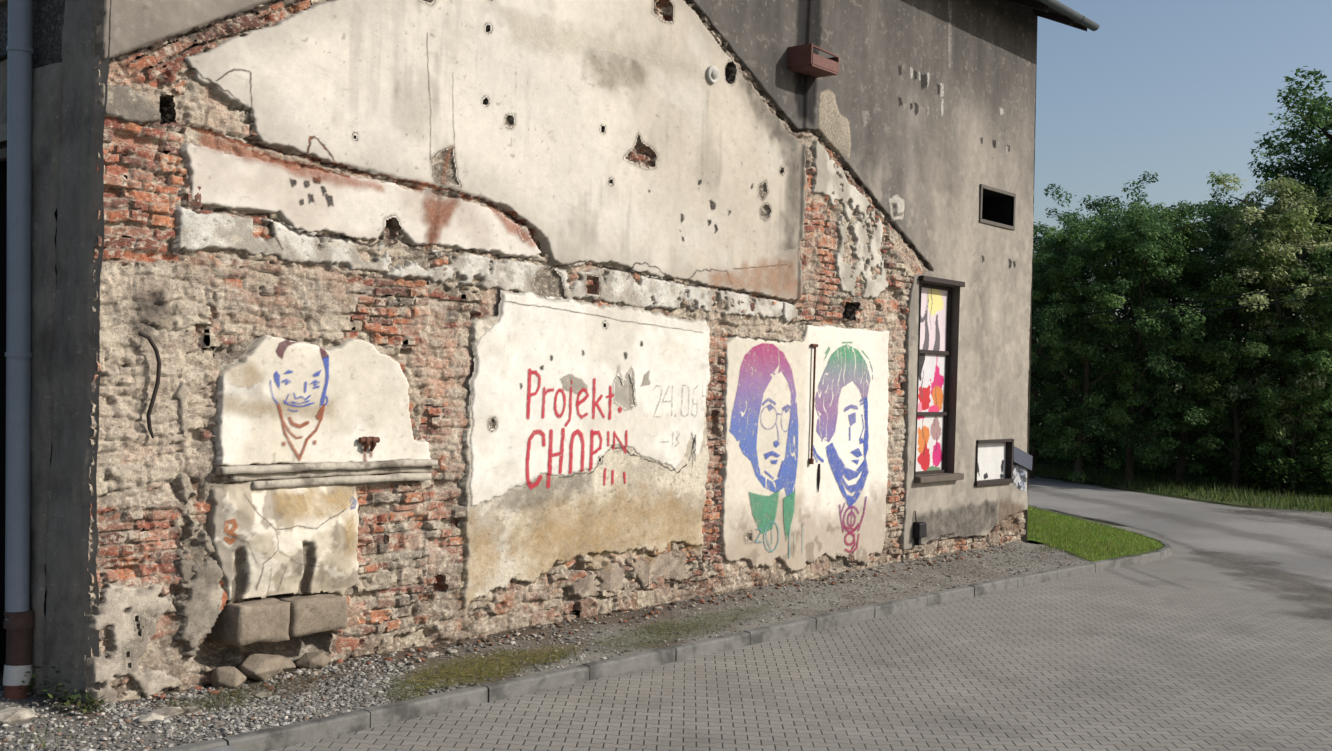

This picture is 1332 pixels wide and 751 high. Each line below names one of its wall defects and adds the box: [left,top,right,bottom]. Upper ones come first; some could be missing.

spalling [652,0,675,23]
spalling [108,0,329,95]
spalling [504,113,516,129]
spalling [898,66,944,116]
rust [412,183,462,245]
spalling [795,90,1026,563]
spalling [88,117,732,671]